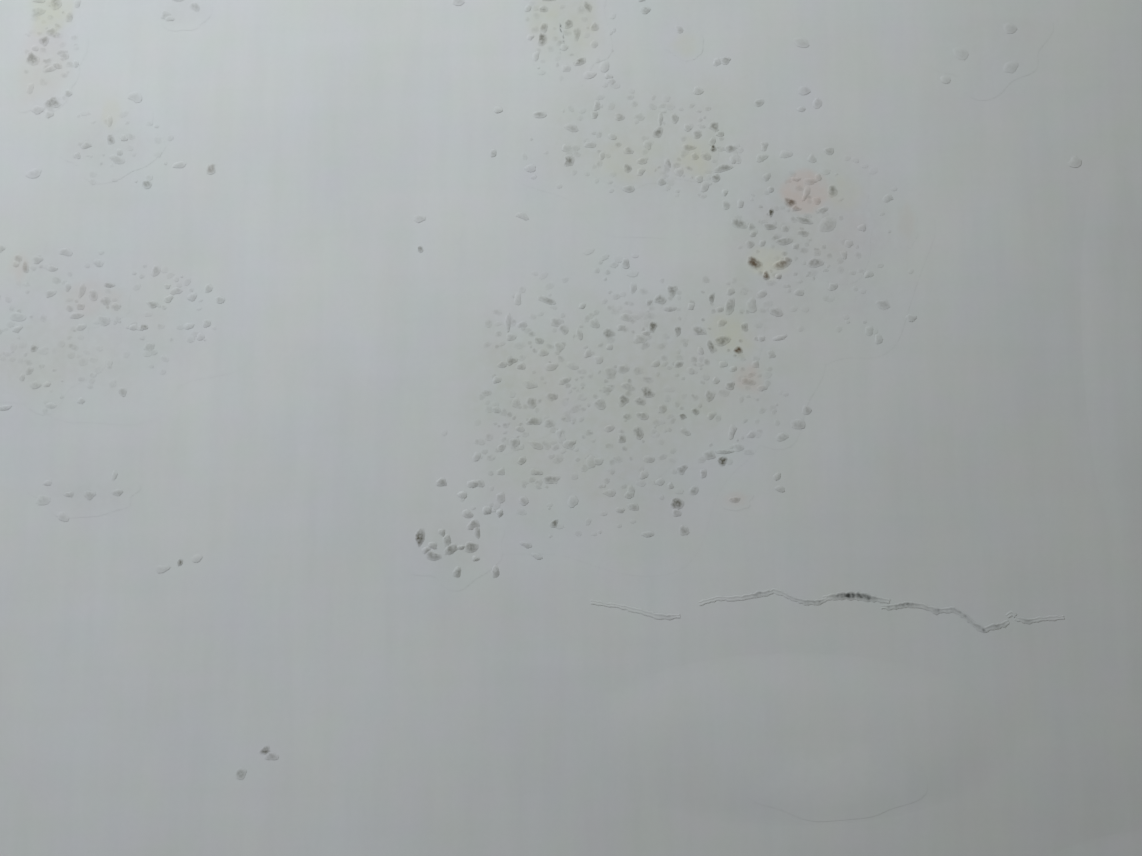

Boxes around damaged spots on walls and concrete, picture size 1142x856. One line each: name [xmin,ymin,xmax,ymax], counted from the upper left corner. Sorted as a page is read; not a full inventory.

leakage [414,0,936,577]
crack [591,588,1064,633]